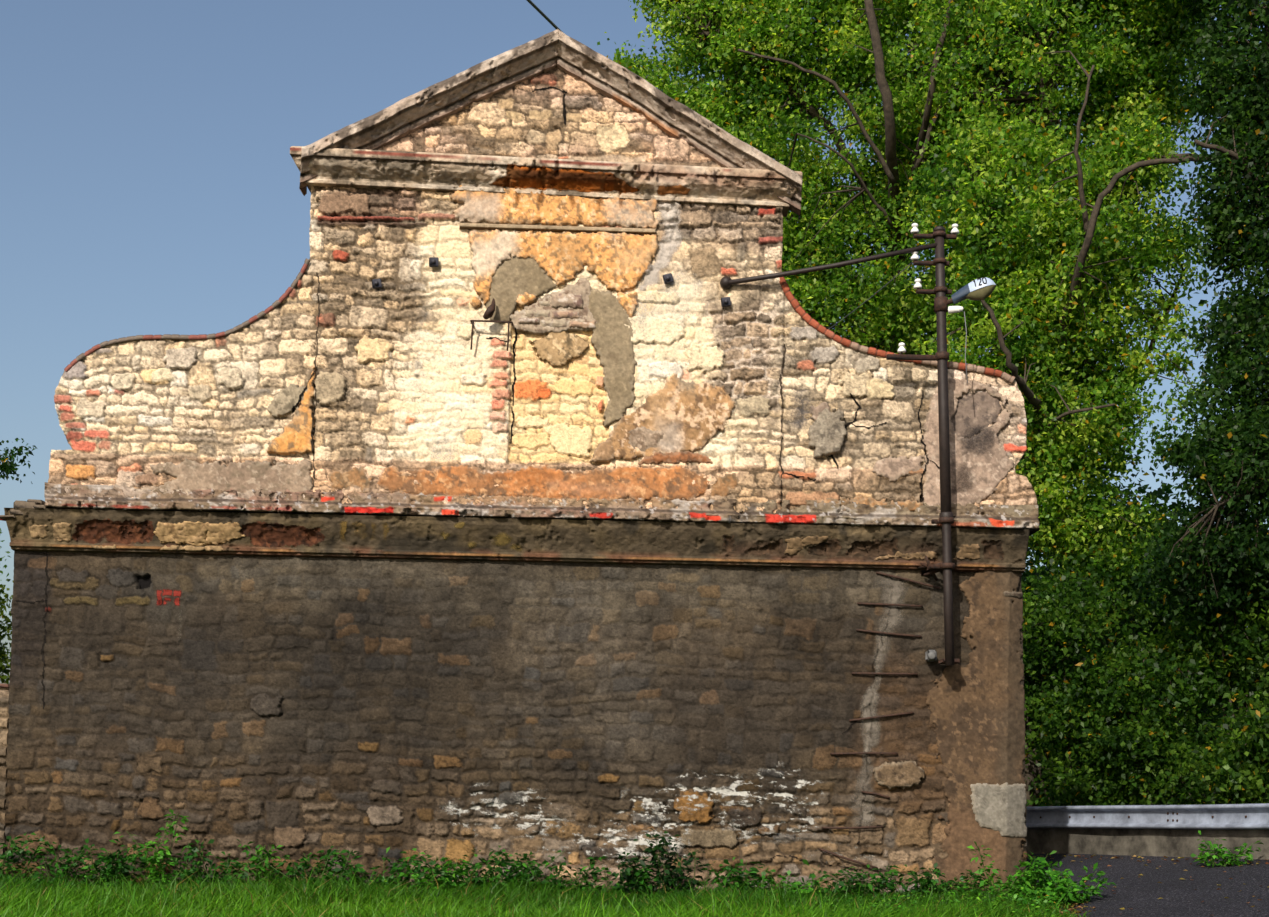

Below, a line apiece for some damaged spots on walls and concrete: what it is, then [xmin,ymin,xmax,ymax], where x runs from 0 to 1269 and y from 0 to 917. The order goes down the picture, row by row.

peeling [328,185,740,501]
crack [779,344,887,507]
crack [918,390,940,505]
peeling [29,518,325,552]
peeling [721,534,938,561]
peeling [922,539,1027,893]
efflorescence [447,784,562,850]
efflorescence [569,769,818,862]